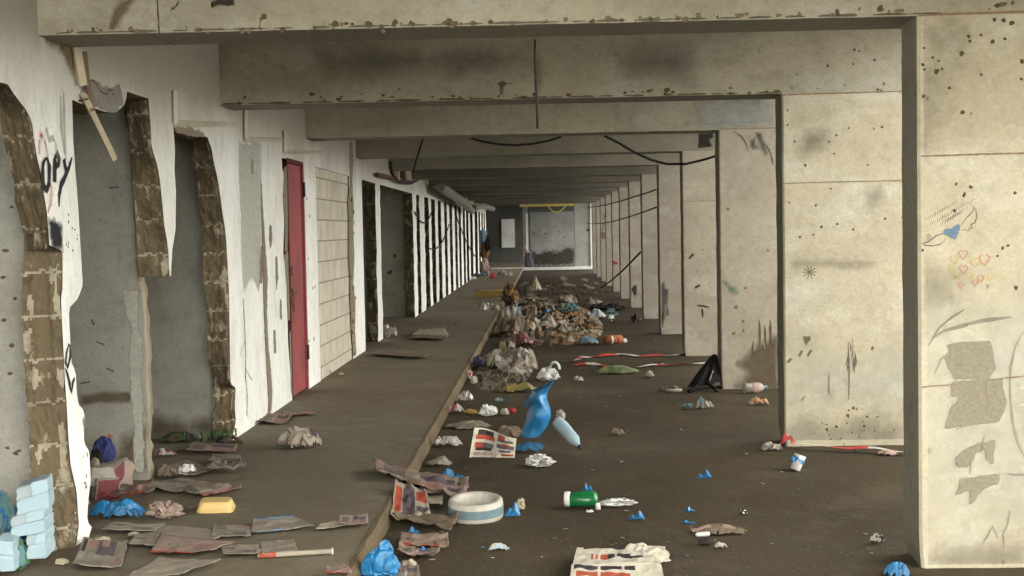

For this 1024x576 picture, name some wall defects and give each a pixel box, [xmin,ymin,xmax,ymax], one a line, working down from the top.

spalling [307,19,415,33]
spalling [83,80,169,277]
spalling [0,84,90,565]
spalling [175,126,236,440]
damp [742,320,812,388]